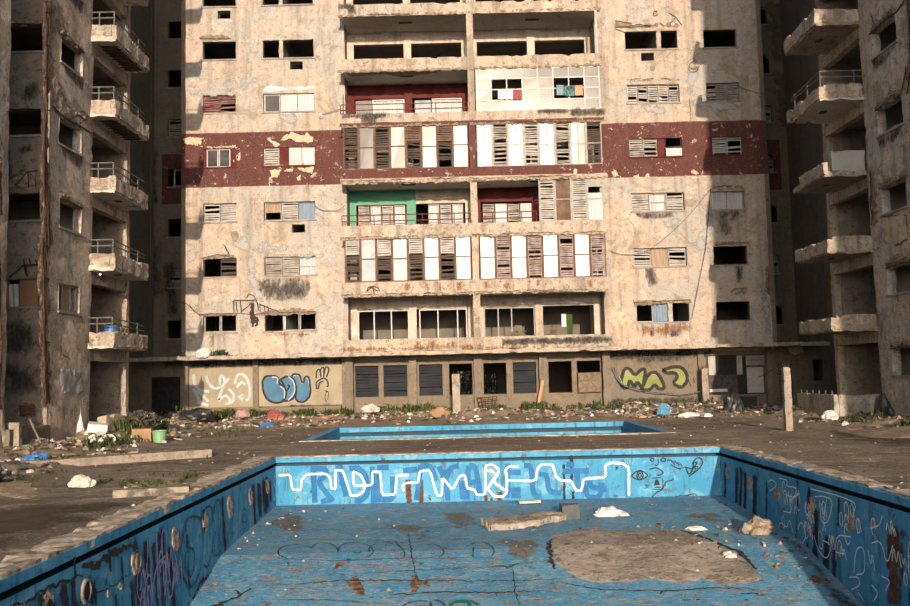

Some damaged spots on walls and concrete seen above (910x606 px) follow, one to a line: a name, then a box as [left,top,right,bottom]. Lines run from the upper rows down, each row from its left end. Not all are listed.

peeling [261,132,313,147]
peeling [270,162,314,181]
spalling [0,0,142,447]
water stain [258,278,309,299]
peeling [550,528,762,585]